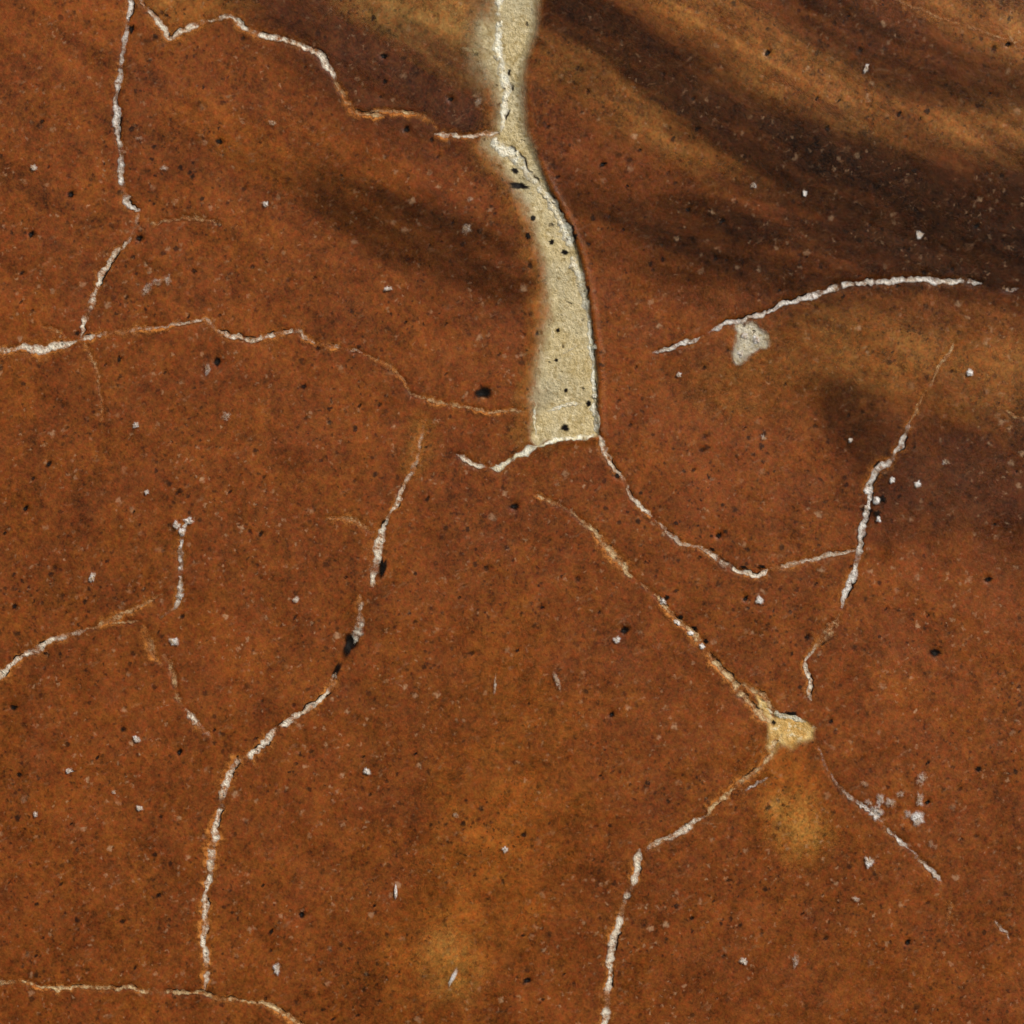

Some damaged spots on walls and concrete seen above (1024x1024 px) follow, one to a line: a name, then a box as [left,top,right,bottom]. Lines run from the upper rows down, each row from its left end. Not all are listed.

crack [113,0,498,225]
spalling [472,0,600,447]
spalling [734,323,768,363]
crack [657,276,979,353]
crack [460,445,535,471]
crack [534,494,557,505]
crack [581,520,633,577]
crack [596,345,953,698]
crack [0,241,516,1024]
spalling [757,695,815,752]
crack [599,594,777,1024]